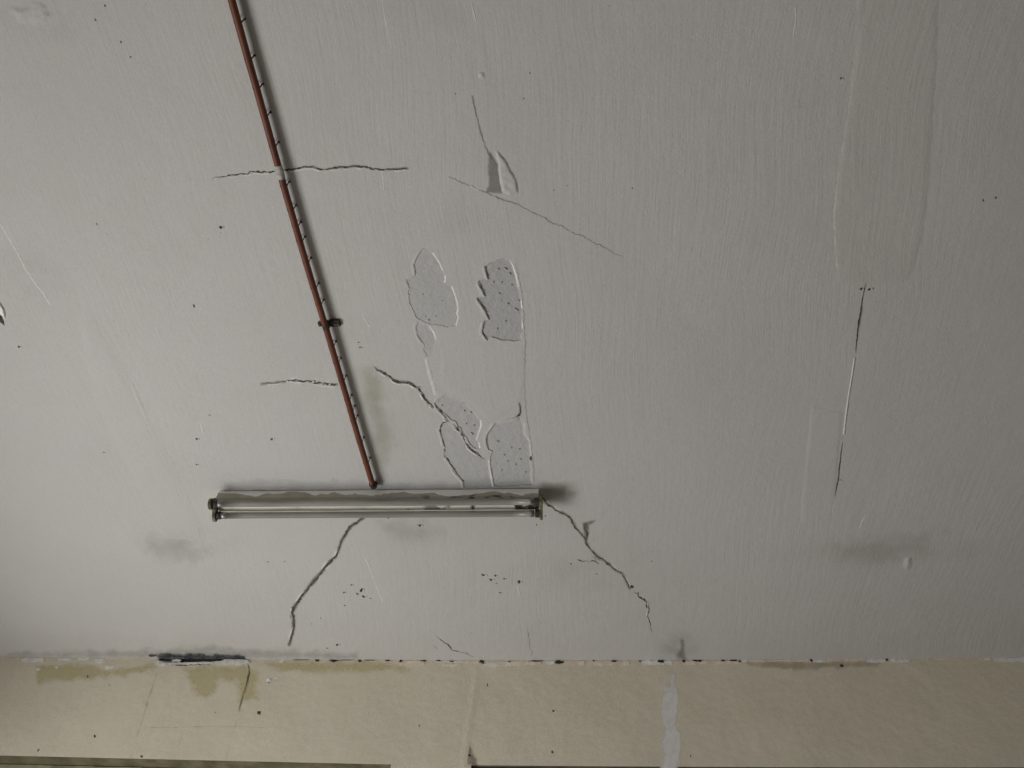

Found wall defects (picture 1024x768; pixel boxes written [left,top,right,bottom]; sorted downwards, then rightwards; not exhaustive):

crack [214,166,408,178]
crack [450,177,623,257]
peeling [404,248,459,356]
peeling [475,258,524,342]
crack [268,377,337,388]
crack [376,369,482,488]
peeling [432,393,533,488]
crack [832,284,866,520]
crack [288,518,364,645]
crack [543,498,652,631]
damp [148,653,249,666]